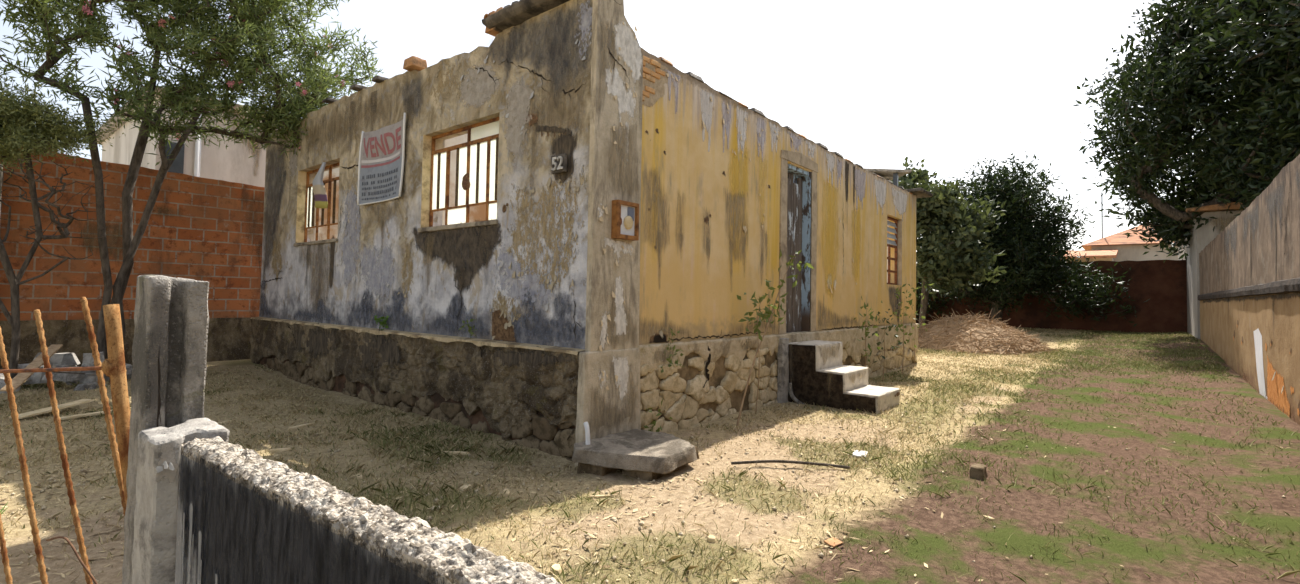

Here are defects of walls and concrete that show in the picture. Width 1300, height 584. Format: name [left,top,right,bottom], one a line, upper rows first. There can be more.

peeling [428,55,572,168]
flaking render [604,20,680,162]
peeling [701,90,907,220]
damp [413,221,501,335]
peeling [489,178,580,342]
damp [492,289,585,367]
spalling [598,238,778,433]